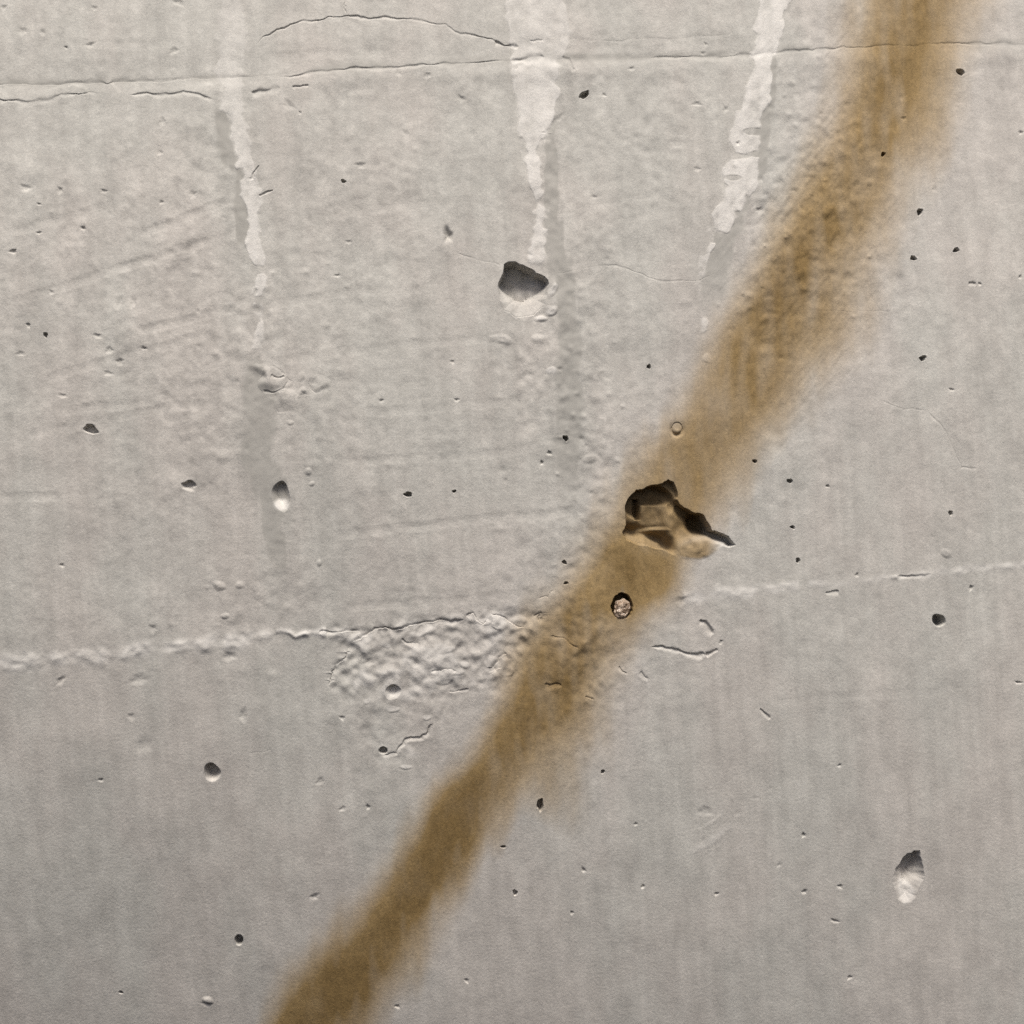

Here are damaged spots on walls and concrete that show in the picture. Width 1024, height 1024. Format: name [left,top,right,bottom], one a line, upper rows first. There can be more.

crack [254,0,519,50]
leakage [699,0,793,315]
leakage [213,0,289,576]
spalling [497,260,559,345]
leakage [504,0,587,516]
rust [255,0,1007,1024]
spalling [622,479,737,562]
crack [617,619,724,682]
spalling [891,849,926,905]